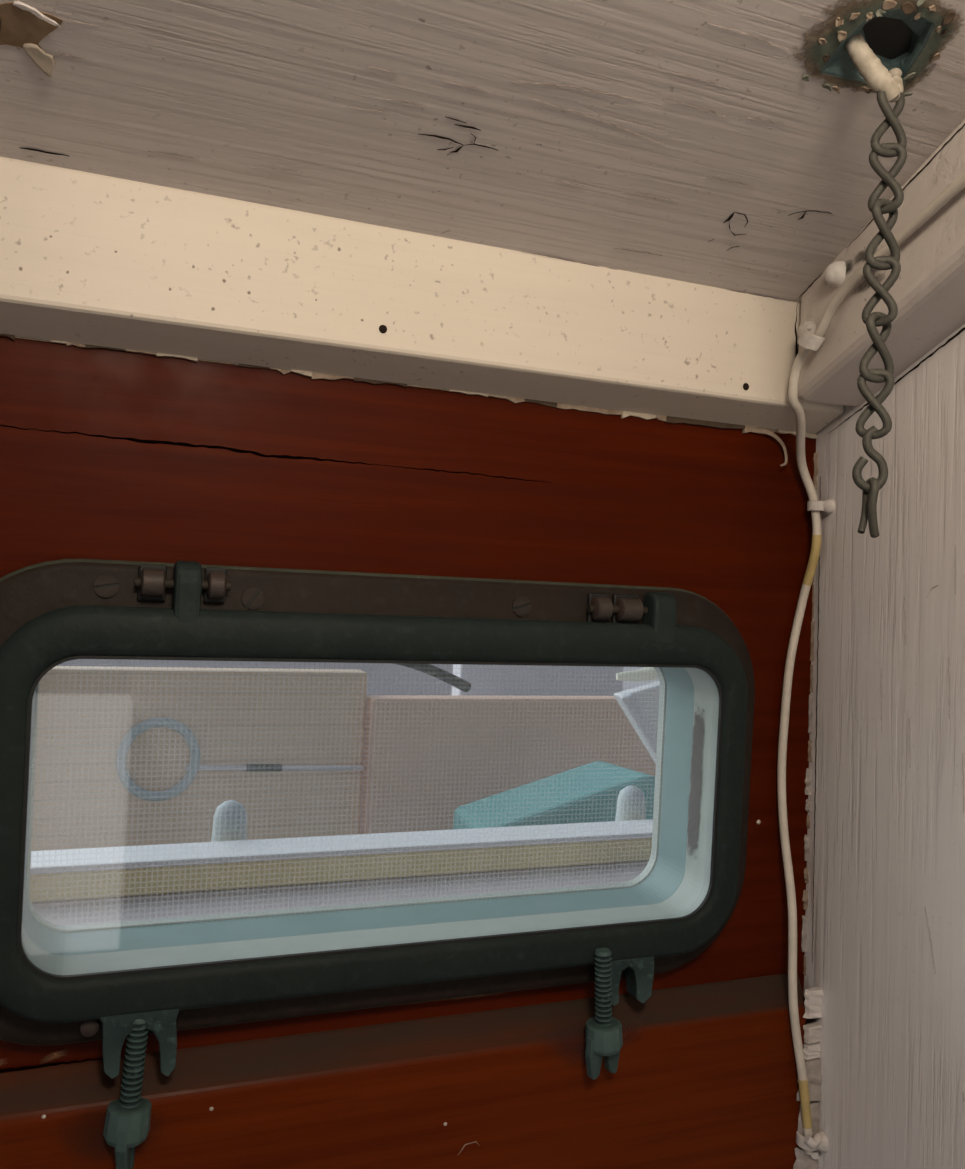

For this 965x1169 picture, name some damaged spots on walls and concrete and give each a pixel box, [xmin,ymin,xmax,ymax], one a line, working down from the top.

peeling [0,1,98,77]
peeling [795,0,963,97]
crack [419,116,498,153]
crack [0,425,550,483]